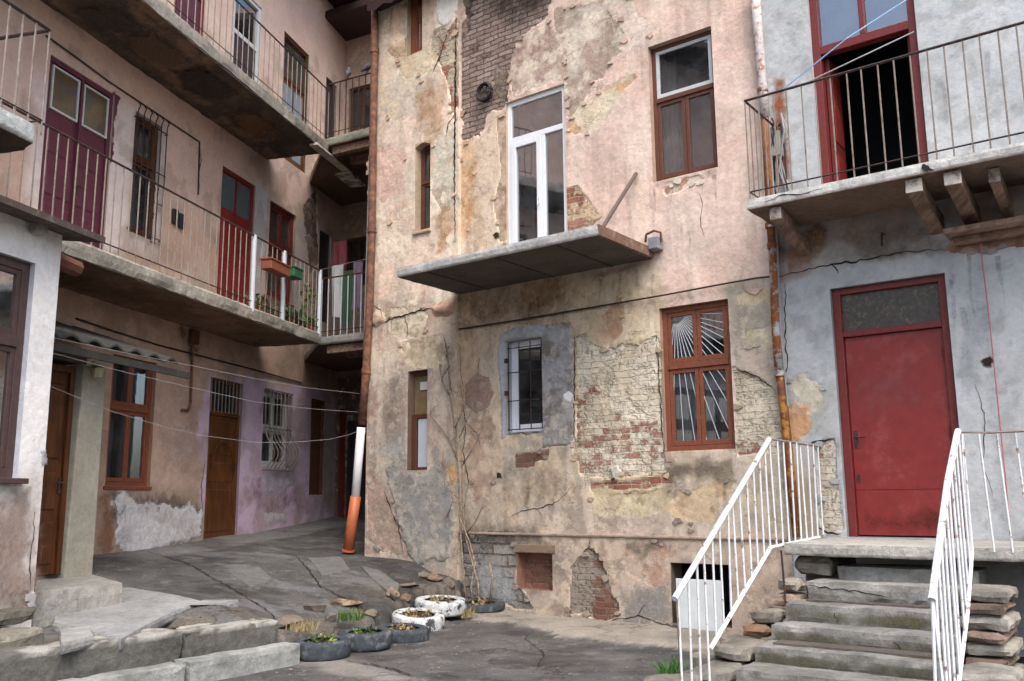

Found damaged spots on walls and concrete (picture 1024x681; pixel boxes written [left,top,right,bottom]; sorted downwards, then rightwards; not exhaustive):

spalling [377,0,653,244]
spalling [664,176,704,195]
crack [373,305,431,334]
crack [733,249,939,387]
spalling [570,292,735,533]
peeling [786,373,826,417]
crack [509,485,573,518]
spalling [564,548,620,621]